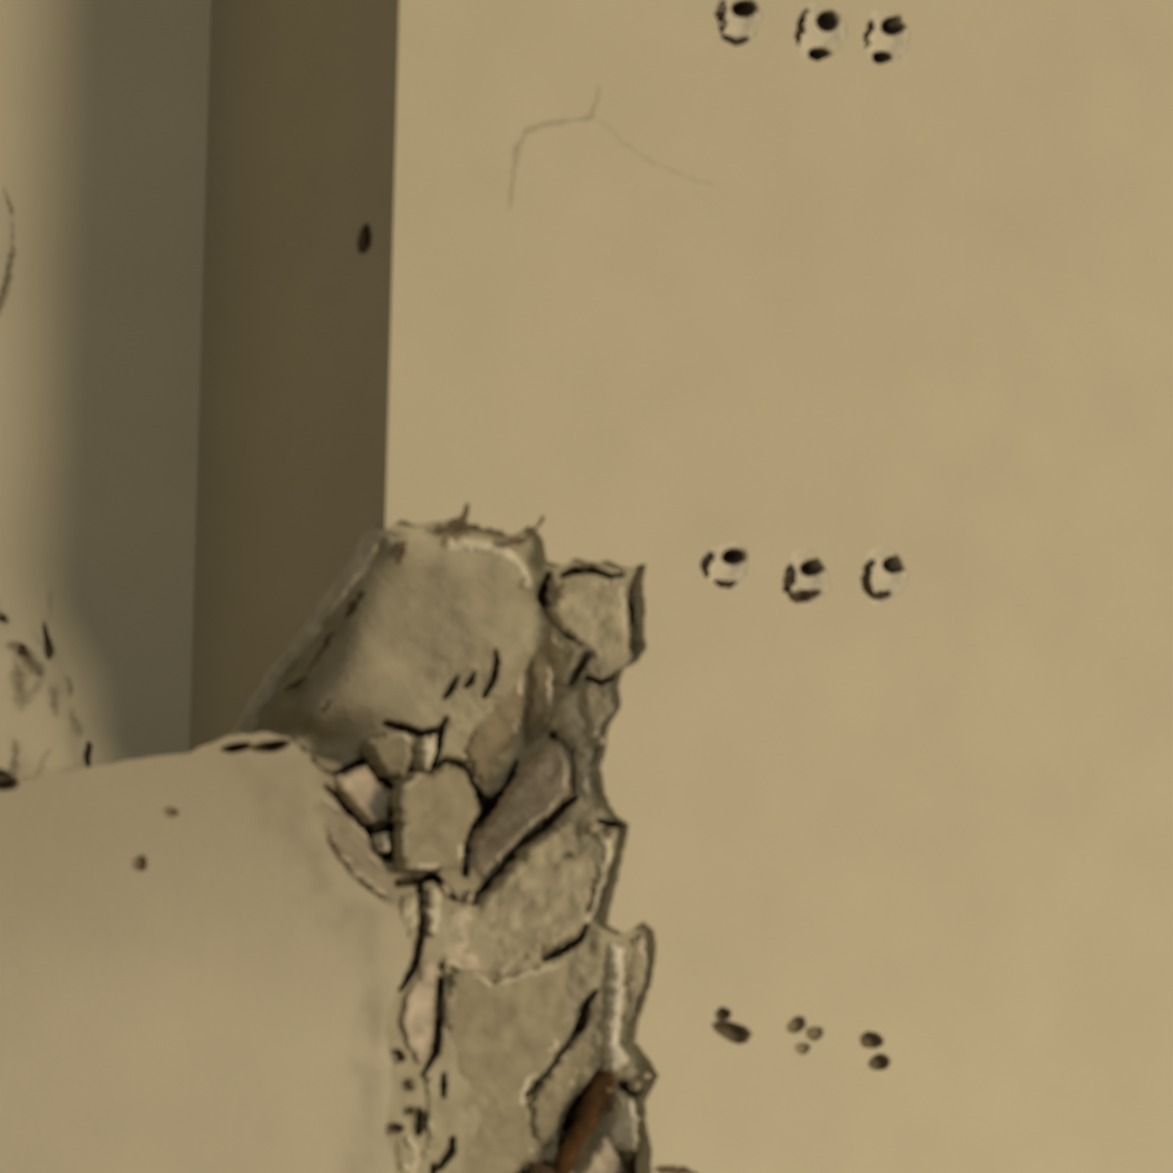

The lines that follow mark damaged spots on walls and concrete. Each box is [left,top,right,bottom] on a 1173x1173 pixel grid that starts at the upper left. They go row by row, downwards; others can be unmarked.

crack [0,614,55,665]
crack [84,740,93,767]
crack [221,739,292,753]
spalling [229,503,654,1173]